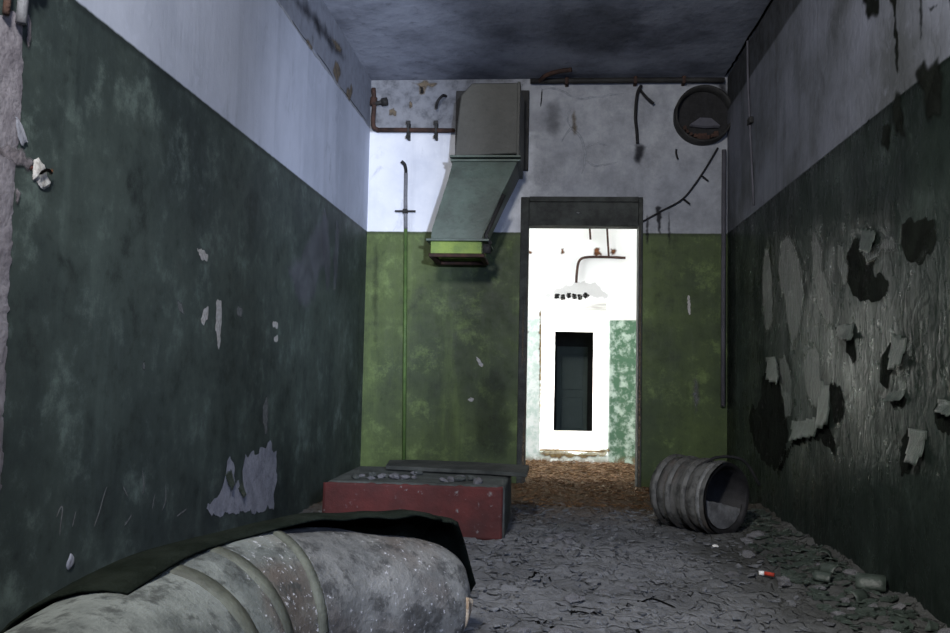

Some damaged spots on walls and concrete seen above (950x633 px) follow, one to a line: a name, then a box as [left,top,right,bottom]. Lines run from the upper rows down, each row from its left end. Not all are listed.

spalling [29,157,53,190]
peeling [201,299,222,349]
peeling [762,230,856,364]
peeling [838,217,936,303]
peeling [880,333,912,409]
peeling [207,397,277,517]
peeling [749,346,844,475]
peeling [899,399,950,477]
crack [520,610,603,628]
crack [626,595,675,608]